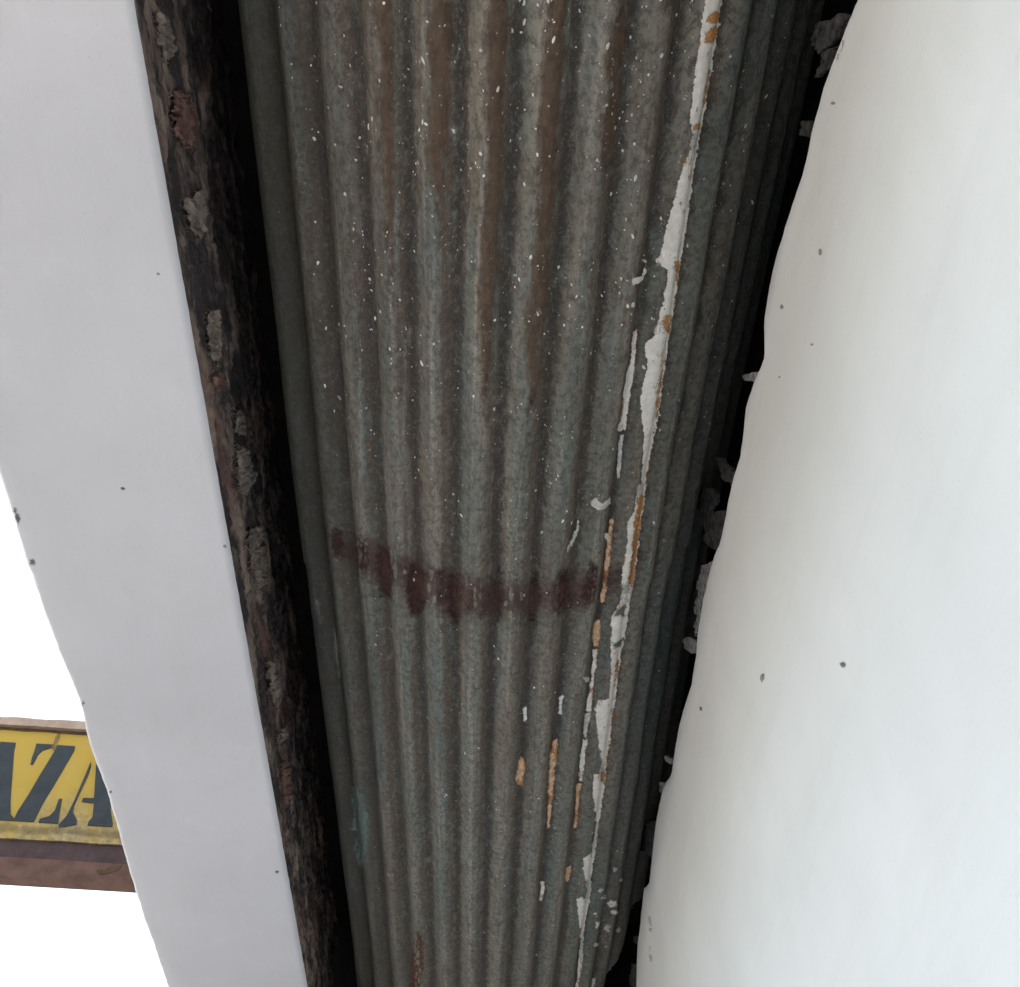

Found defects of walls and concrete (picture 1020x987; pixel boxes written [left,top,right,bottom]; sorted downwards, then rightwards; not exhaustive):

spalling [152,9,178,64]
spalling [179,188,209,241]
corrosion [375,0,394,275]
corrosion [428,0,452,216]
corrosion [480,0,508,397]
corrosion [527,0,568,411]
corrosion [602,4,625,170]
spalling [202,308,223,368]
spalling [231,407,258,499]
spalling [243,523,269,592]
peeling [564,0,722,987]